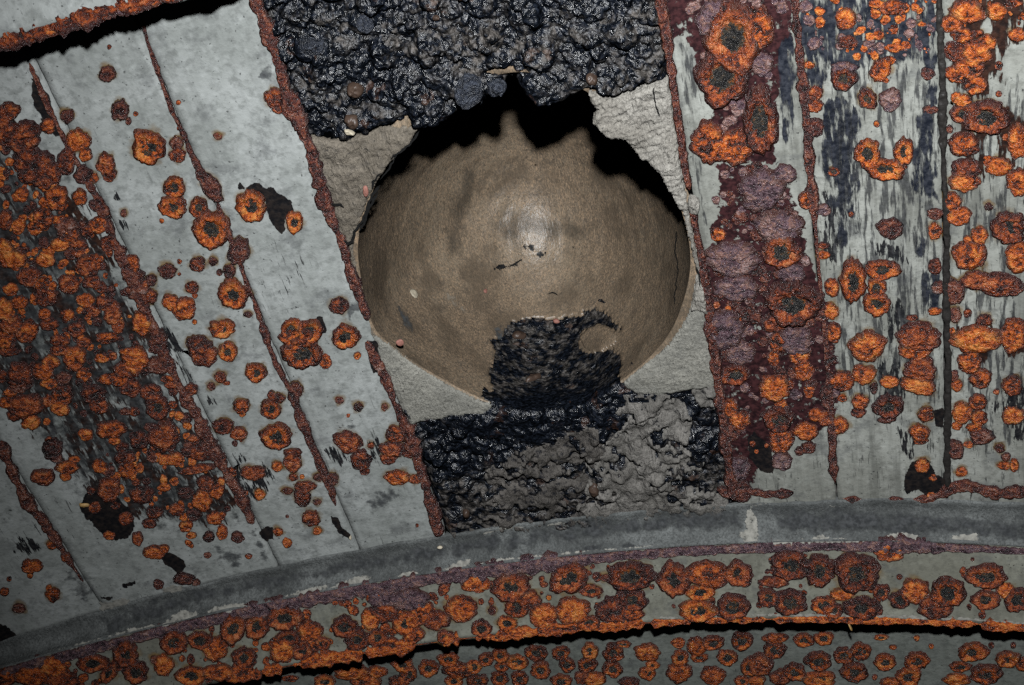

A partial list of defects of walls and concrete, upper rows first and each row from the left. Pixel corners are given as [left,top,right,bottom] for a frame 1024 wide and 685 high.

damp [778,13,816,143]
damp [859,0,938,200]
damp [819,96,861,263]
corrosion [0,0,445,582]
peeling [580,323,616,353]
corrosion [654,0,1024,503]
damp [873,237,927,265]
damp [921,272,940,308]
damp [80,490,135,541]
peeling [331,516,352,540]
damp [897,424,945,495]
corrosion [0,533,1024,685]